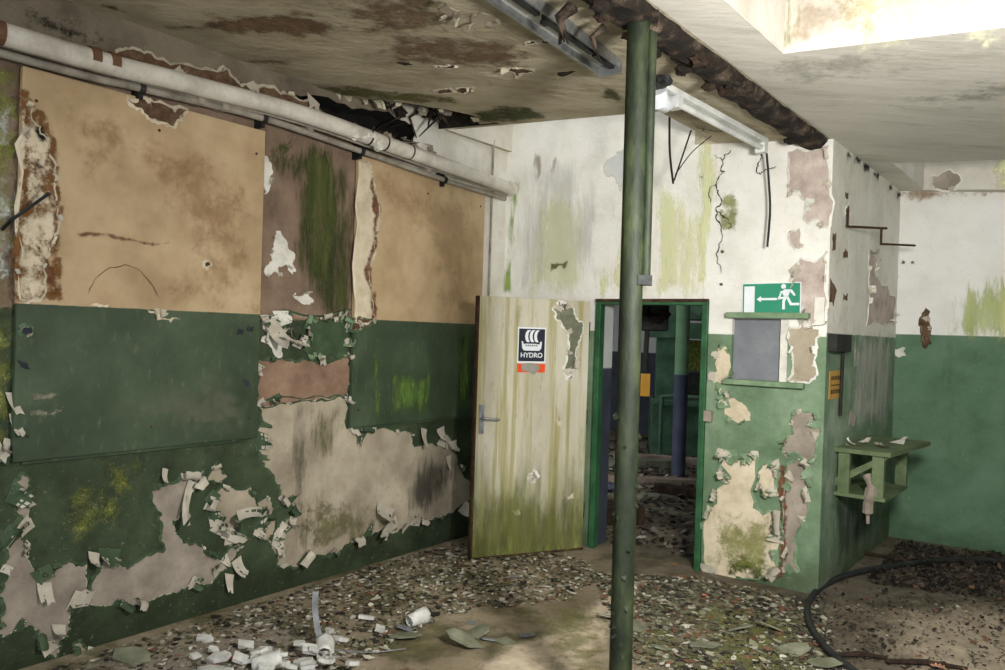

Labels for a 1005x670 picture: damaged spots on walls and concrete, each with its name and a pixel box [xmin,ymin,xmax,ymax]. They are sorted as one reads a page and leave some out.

damp [206,12,332,38]
damp [353,0,527,66]
flaking render [115,46,437,154]
peeling [14,101,64,304]
flaking render [929,168,964,193]
flaking render [786,145,850,384]
peeling [0,156,470,660]
peeling [708,344,751,425]
peeling [700,409,822,583]